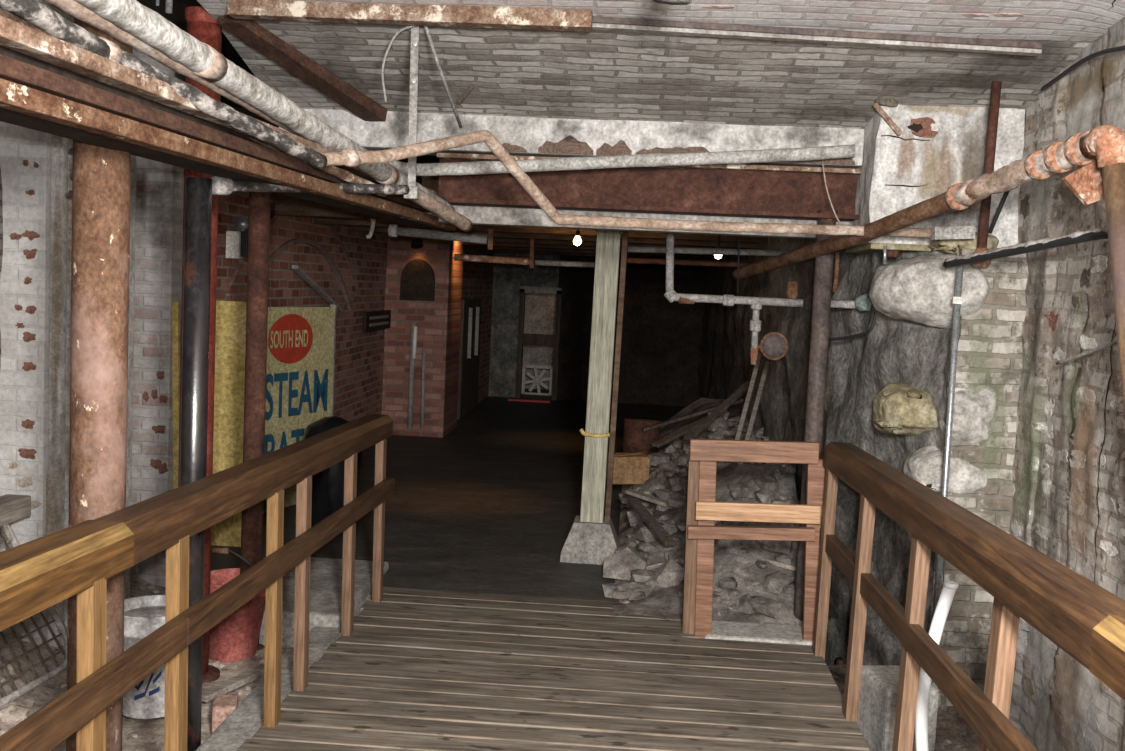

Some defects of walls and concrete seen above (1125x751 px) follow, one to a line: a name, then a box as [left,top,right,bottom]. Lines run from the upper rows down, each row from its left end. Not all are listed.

spalling [502,136,709,156]